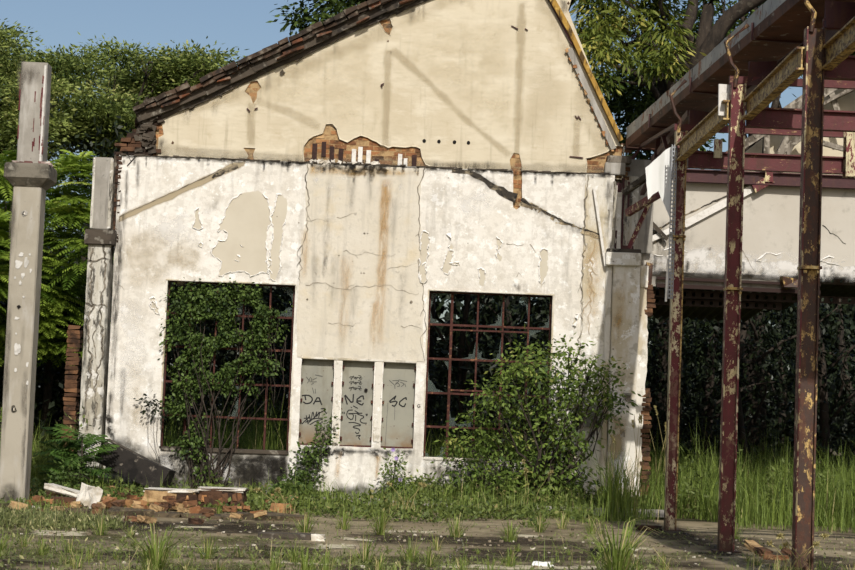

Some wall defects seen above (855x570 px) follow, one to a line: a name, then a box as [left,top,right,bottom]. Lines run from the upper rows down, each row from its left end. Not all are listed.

flaking render [378,18,394,42]
flaking render [245,81,261,104]
flaking render [302,123,431,167]
flaking render [510,153,522,209]
peeling [14,252,32,285]
peeling [192,207,204,230]
peeling [198,190,288,282]
crack [297,162,435,361]
peeling [418,230,430,284]
peeling [441,233,460,275]
peeling [538,248,548,287]